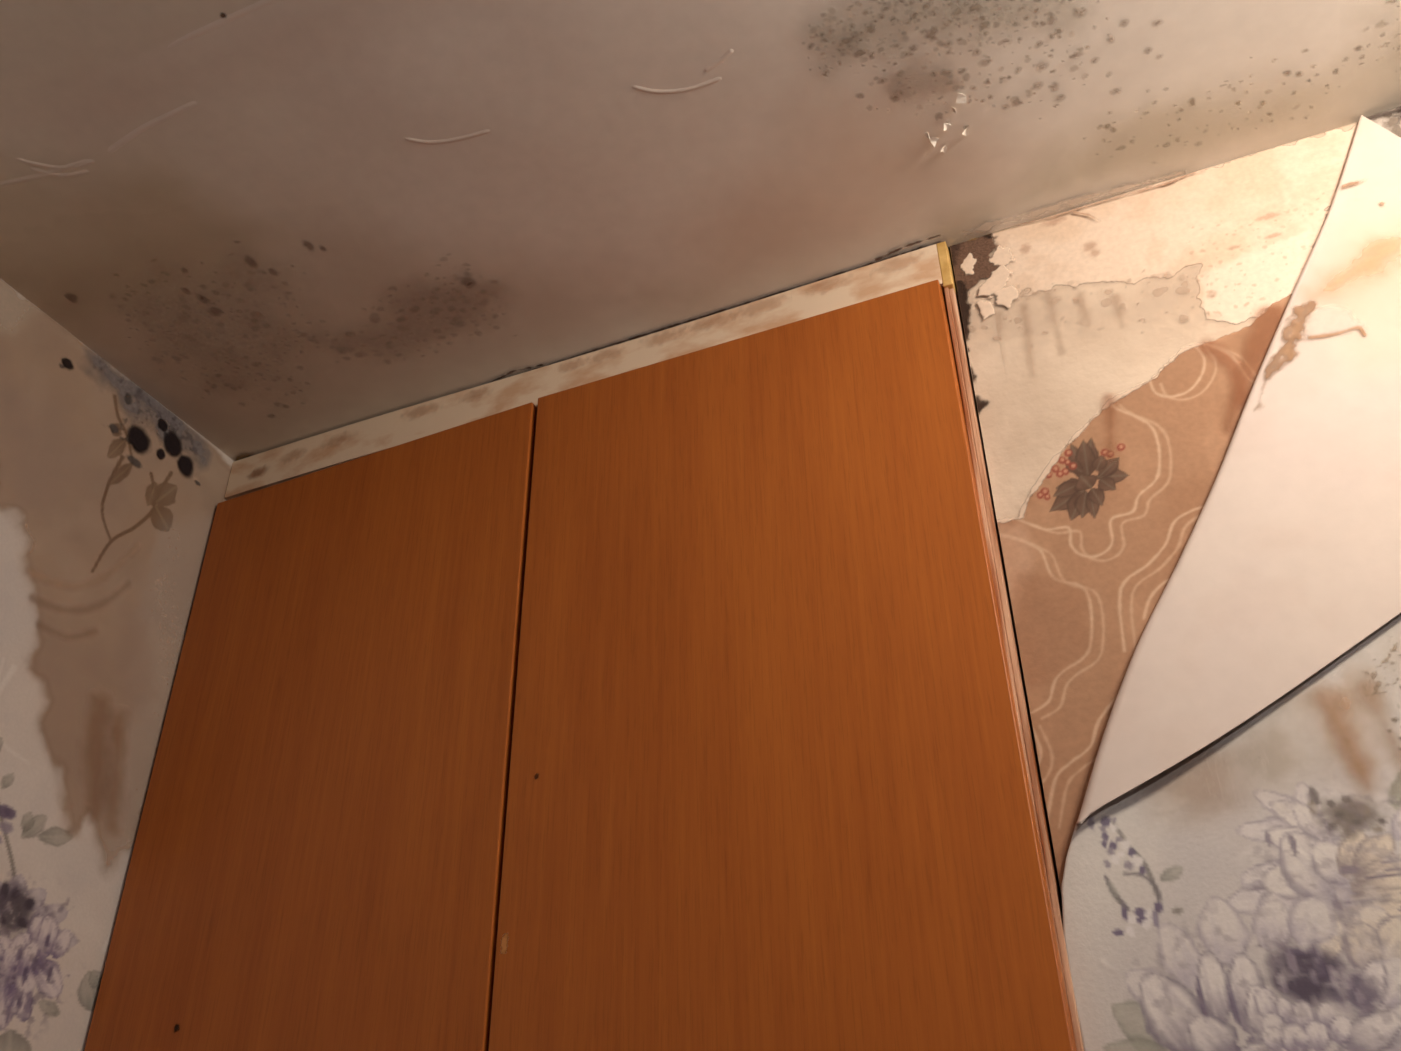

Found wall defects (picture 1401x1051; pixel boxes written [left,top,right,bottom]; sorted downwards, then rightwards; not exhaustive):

water stain [809,0,1063,108]
water stain [1369,113,1401,138]
flaking render [960,124,1358,324]